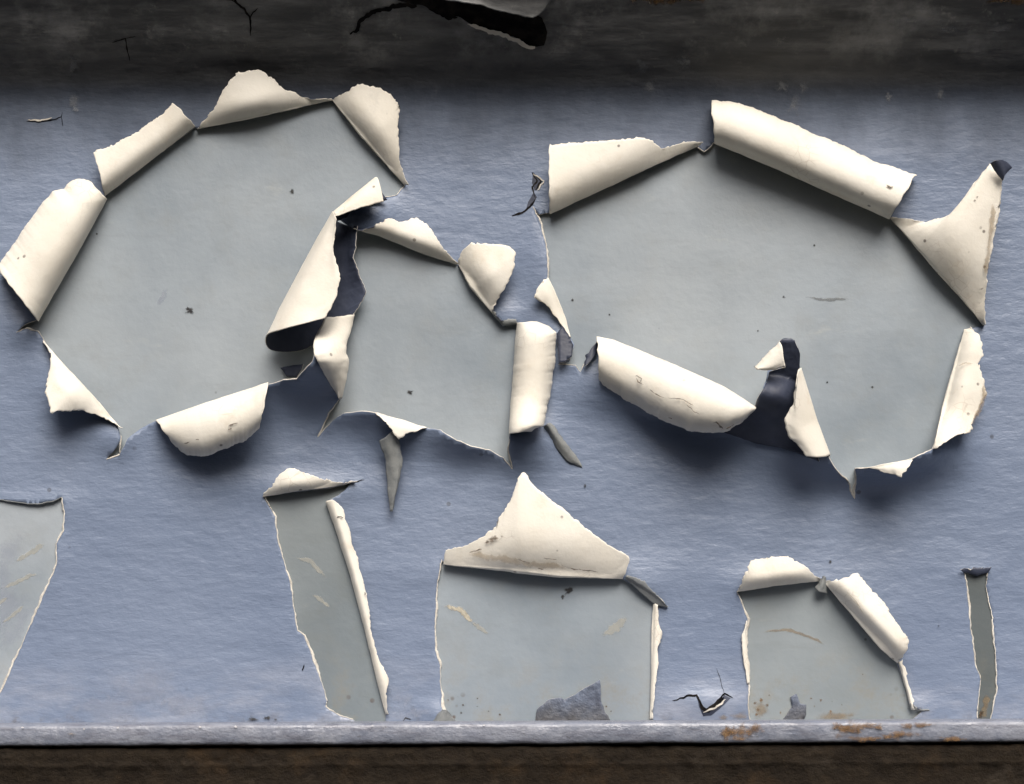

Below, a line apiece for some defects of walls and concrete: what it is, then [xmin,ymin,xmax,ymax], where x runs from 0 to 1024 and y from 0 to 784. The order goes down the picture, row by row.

crack [231,0,258,36]
peeling [350,0,552,49]
peeling [0,70,1012,512]
peeling [0,497,65,693]
peeling [263,468,389,721]
corrosion [0,723,1024,784]
peeling [433,472,668,721]
crack [672,668,733,716]
peeling [737,556,930,720]
peeling [961,567,998,719]